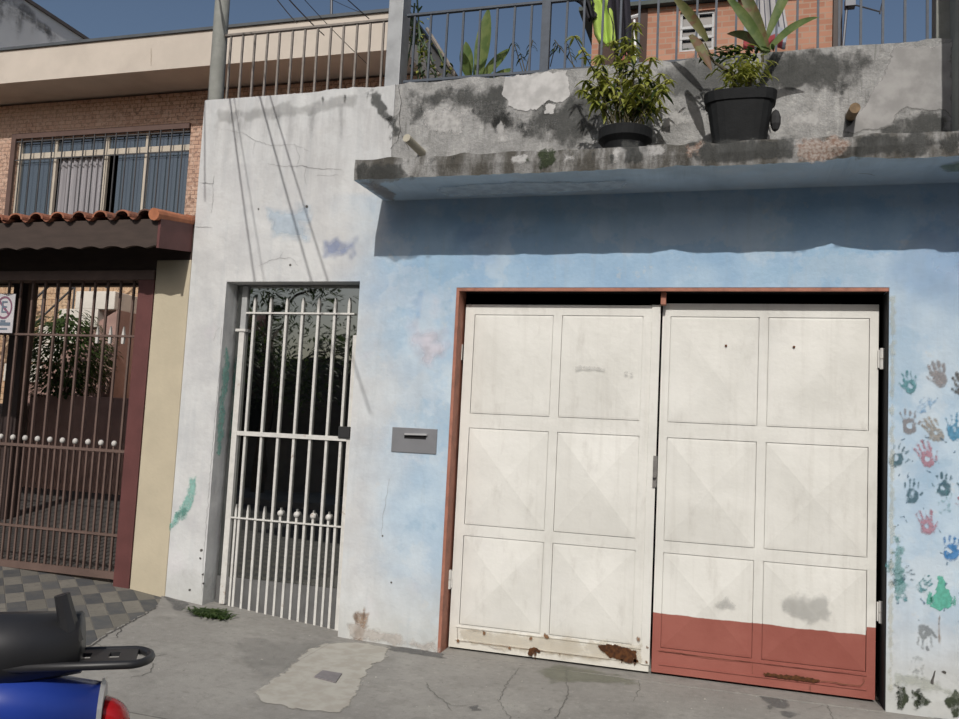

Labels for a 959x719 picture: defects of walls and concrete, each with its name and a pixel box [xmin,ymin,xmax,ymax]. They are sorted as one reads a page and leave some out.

peeling [502,70,570,114]
water stain [412,85,600,170]
rust [598,637,649,665]
crack [457,630,600,719]
water stain [895,685,930,710]
water stain [945,690,959,717]